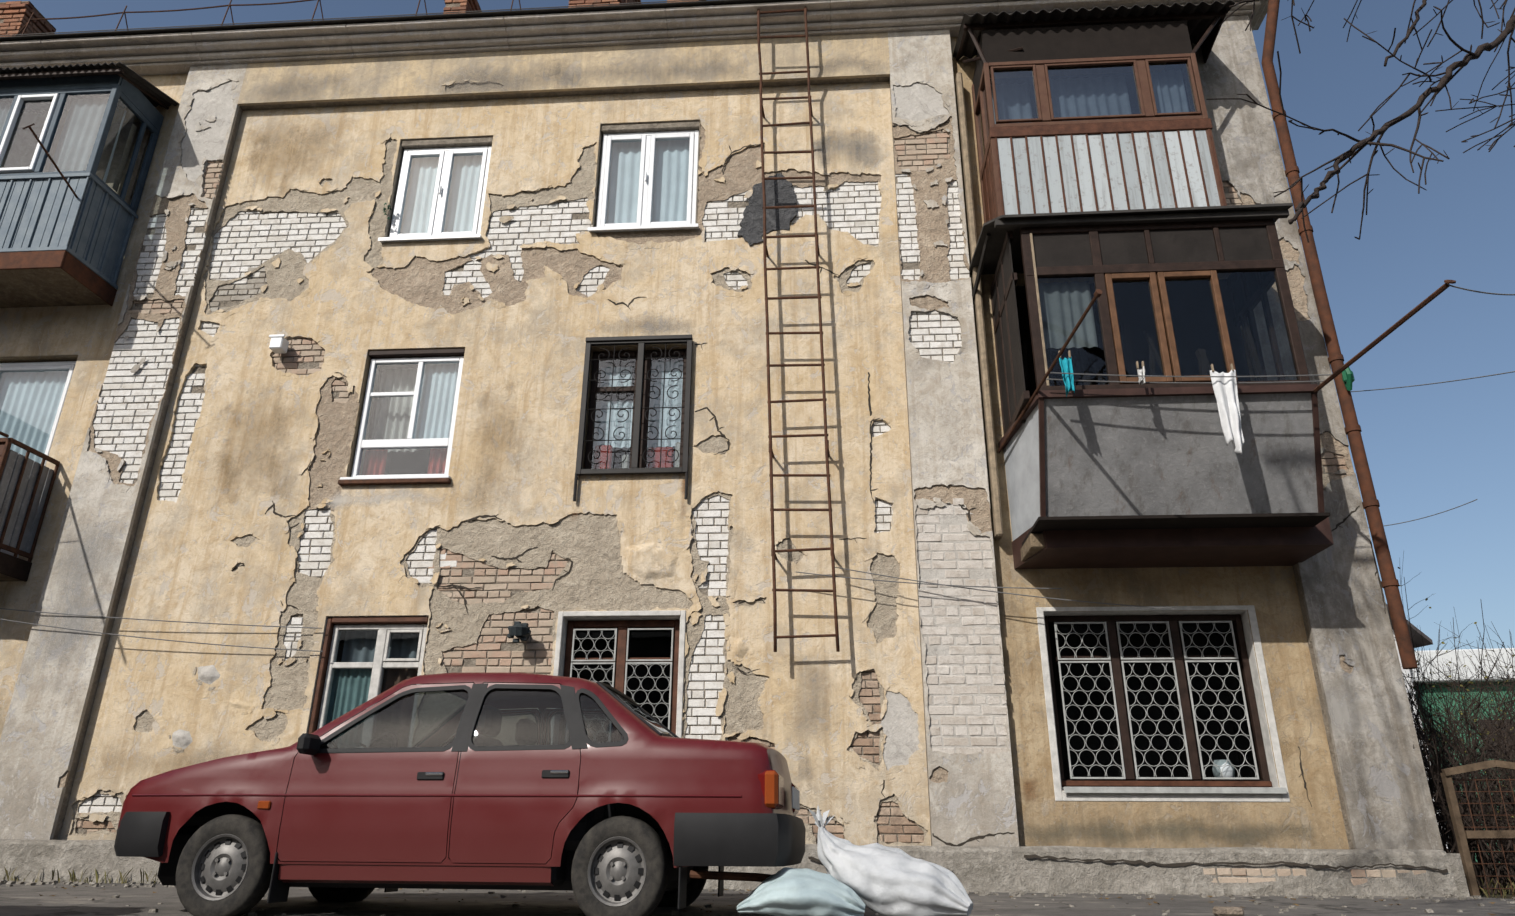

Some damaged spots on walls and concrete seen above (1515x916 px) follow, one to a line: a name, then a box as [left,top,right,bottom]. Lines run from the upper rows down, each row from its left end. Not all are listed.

peeling [88,74,970,503]
peeling [231,531,259,575]
peeling [246,337,359,746]
peeling [398,492,776,750]
flaking render [796,478,1008,846]